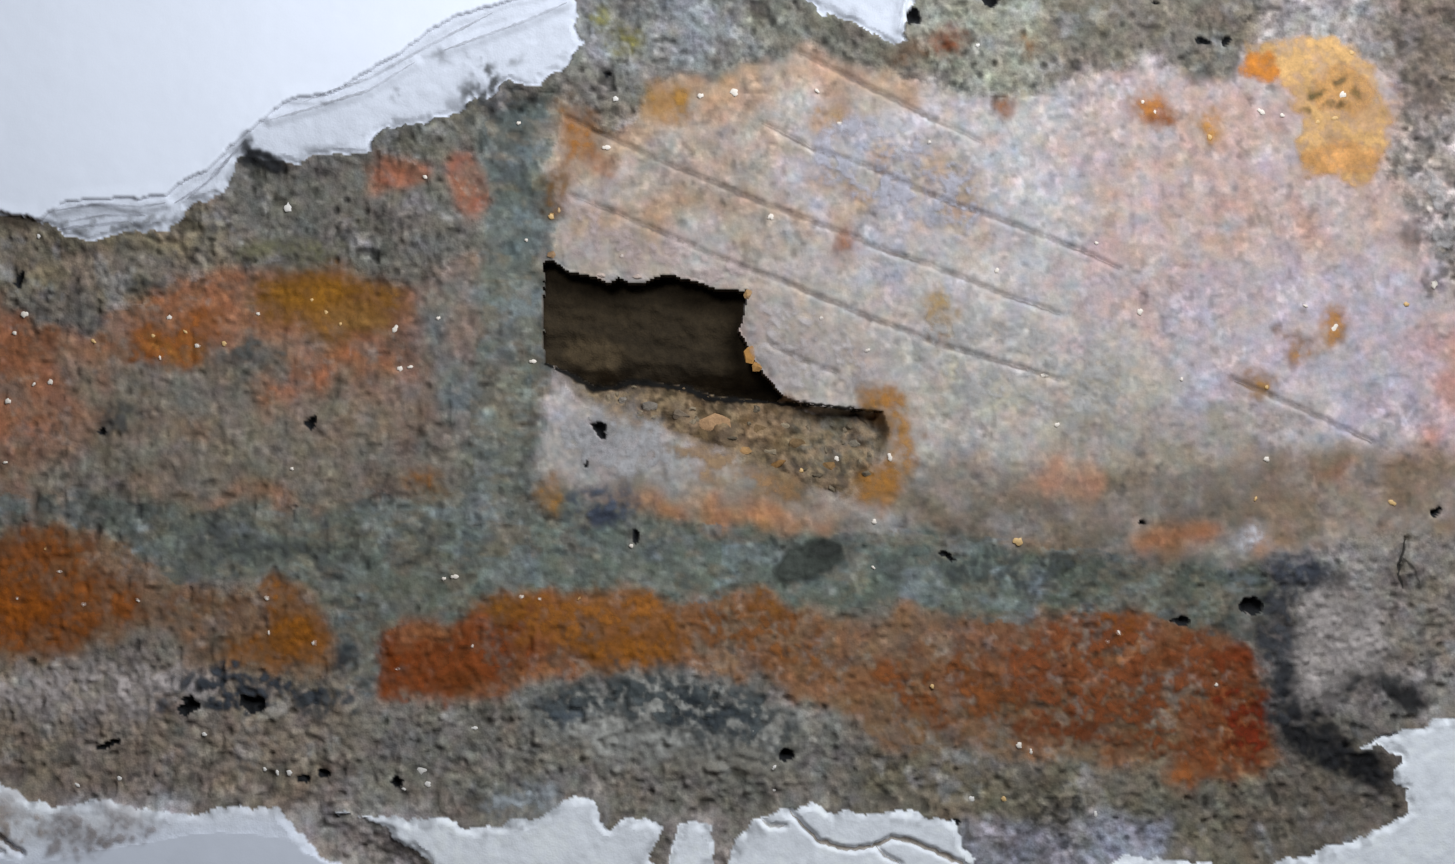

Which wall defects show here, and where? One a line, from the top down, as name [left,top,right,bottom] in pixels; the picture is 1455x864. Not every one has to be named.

flaking render [0,0,1455,337]
rust [1240,36,1392,184]
rust [131,309,219,366]
spalling [305,416,317,432]
rust [255,272,400,339]
spalling [544,251,892,503]
rust [861,388,913,500]
rust [0,527,137,651]
rust [487,589,820,673]
flaking render [0,507,1455,864]
rust [873,613,1267,782]